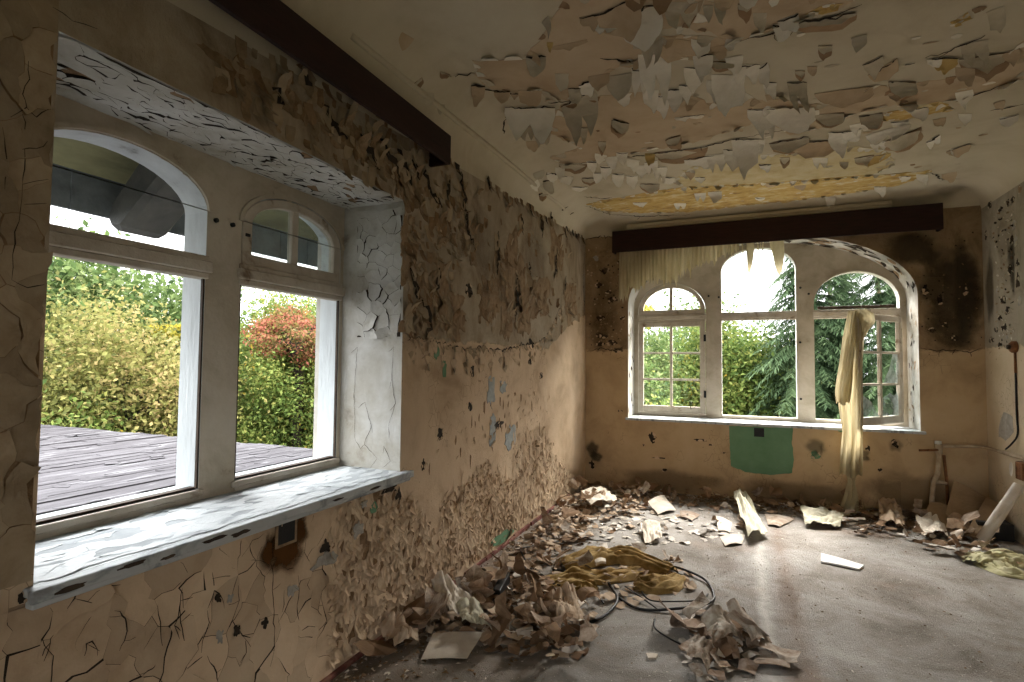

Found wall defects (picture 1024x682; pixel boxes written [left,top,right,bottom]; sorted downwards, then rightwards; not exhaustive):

crack [0,0,671,682]
peeling [56,0,1024,451]
crack [633,130,784,157]
leakage [892,234,993,345]